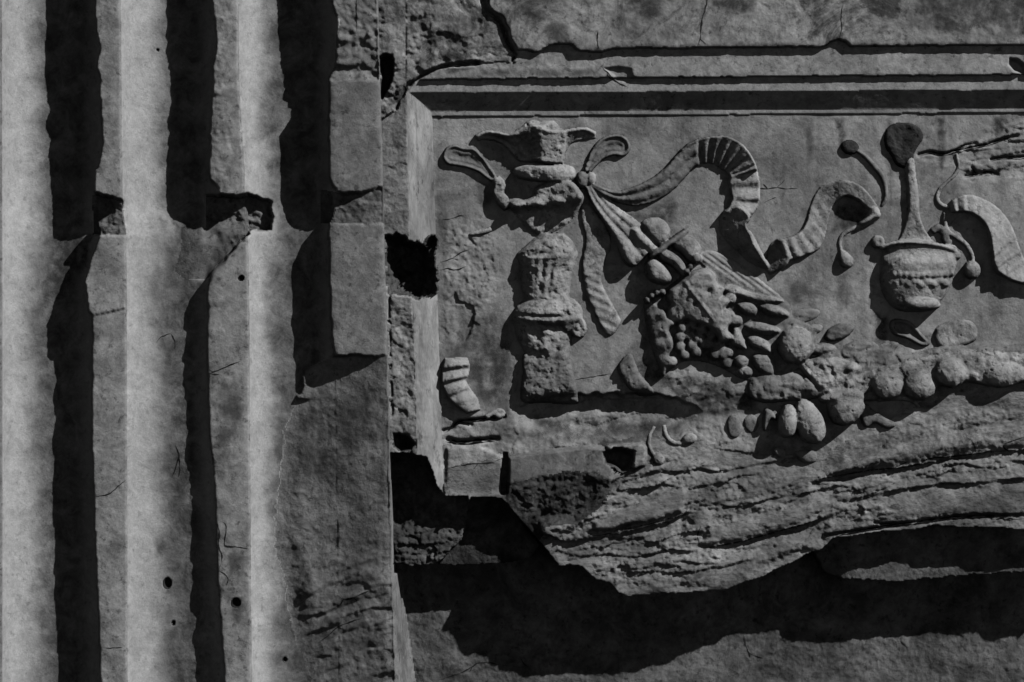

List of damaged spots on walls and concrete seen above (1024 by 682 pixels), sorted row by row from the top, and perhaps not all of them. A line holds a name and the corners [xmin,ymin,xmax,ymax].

spalling [380,54,394,99]
spalling [385,223,499,346]
spalling [391,383,1024,596]